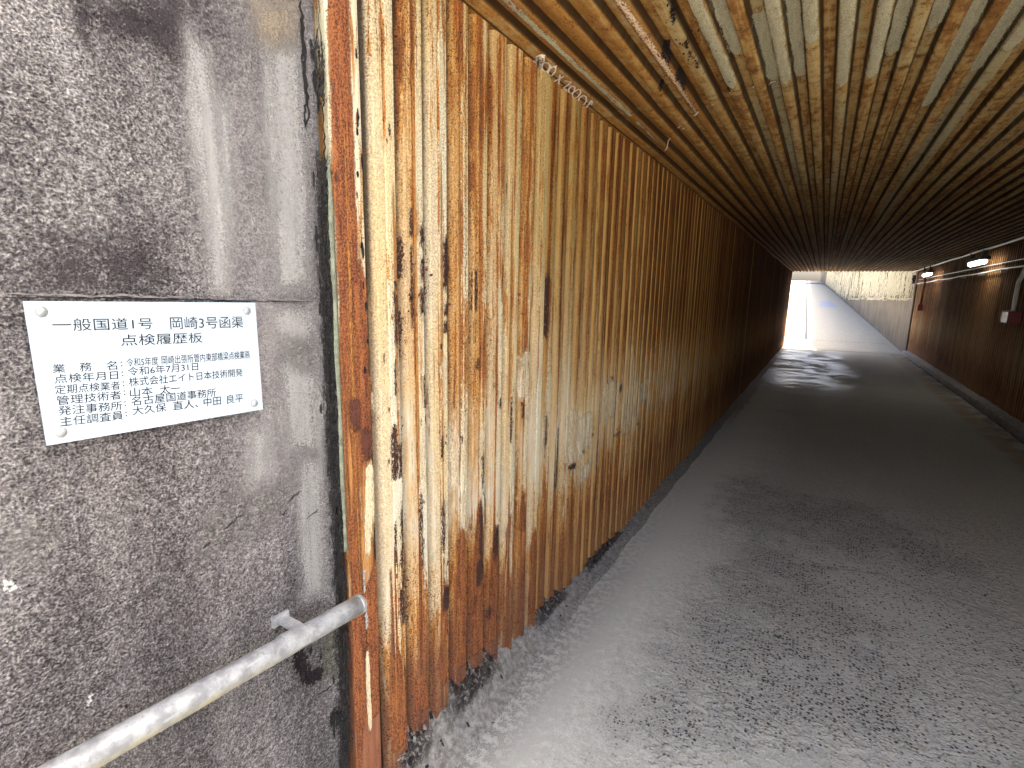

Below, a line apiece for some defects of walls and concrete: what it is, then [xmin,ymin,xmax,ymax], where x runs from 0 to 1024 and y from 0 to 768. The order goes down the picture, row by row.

leakage [310,36,327,114]
corrosion [326,0,537,768]